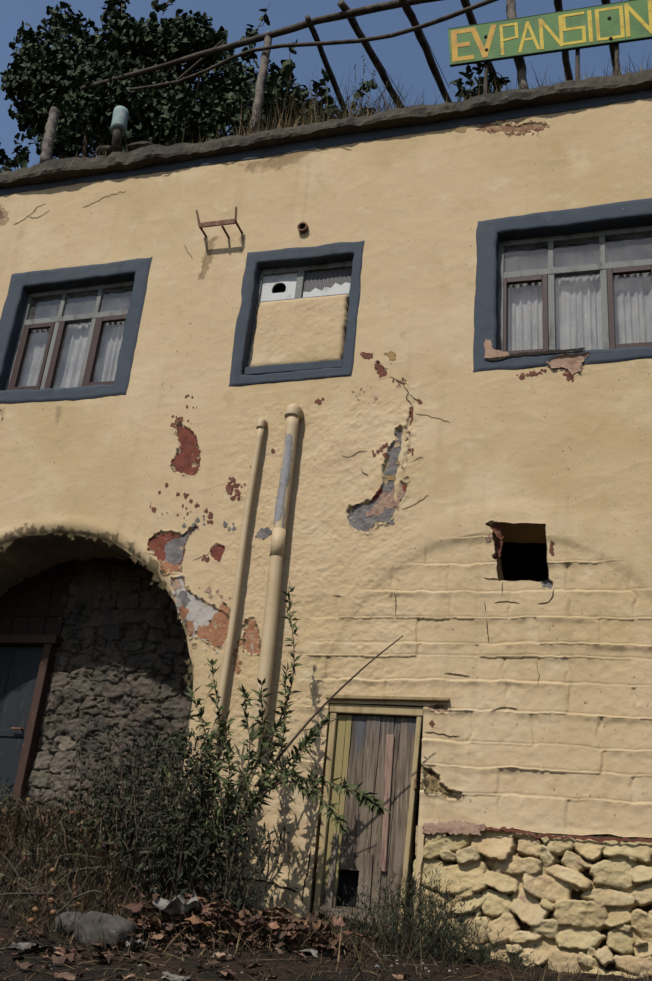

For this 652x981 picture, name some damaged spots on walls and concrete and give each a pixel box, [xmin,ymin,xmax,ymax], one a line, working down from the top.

peeling [453,118,549,137]
crack [352,351,449,422]
flaking render [484,339,509,358]
spalling [517,352,589,381]
peeling [170,394,201,475]
peeling [226,477,245,500]
peeling [255,433,293,539]
spalling [346,408,414,535]
peeling [147,483,261,674]
spalling [420,756,464,799]
spalling [422,820,652,843]